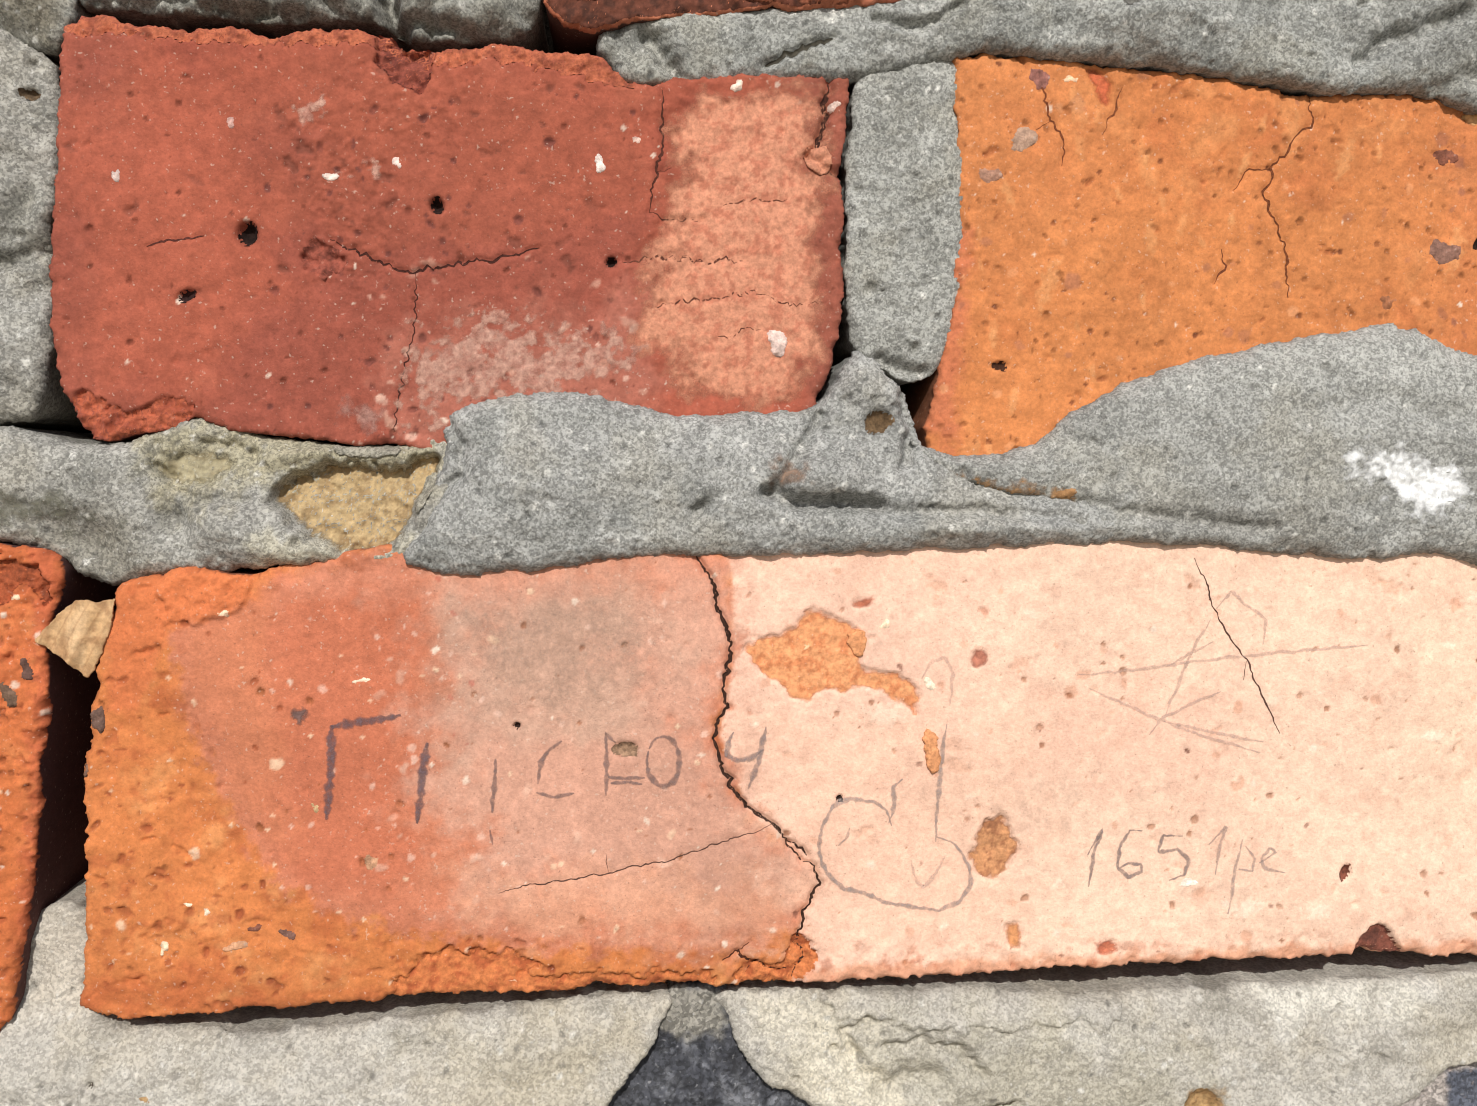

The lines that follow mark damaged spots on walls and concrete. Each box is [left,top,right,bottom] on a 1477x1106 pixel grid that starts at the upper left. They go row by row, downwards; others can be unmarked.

crack [1234,97,1314,297]
crack [330,239,538,430]
spalling [278,444,439,550]
water stain [1343,442,1469,517]
spalling [746,612,919,712]
crack [500,556,821,976]
spalling [922,728,941,774]